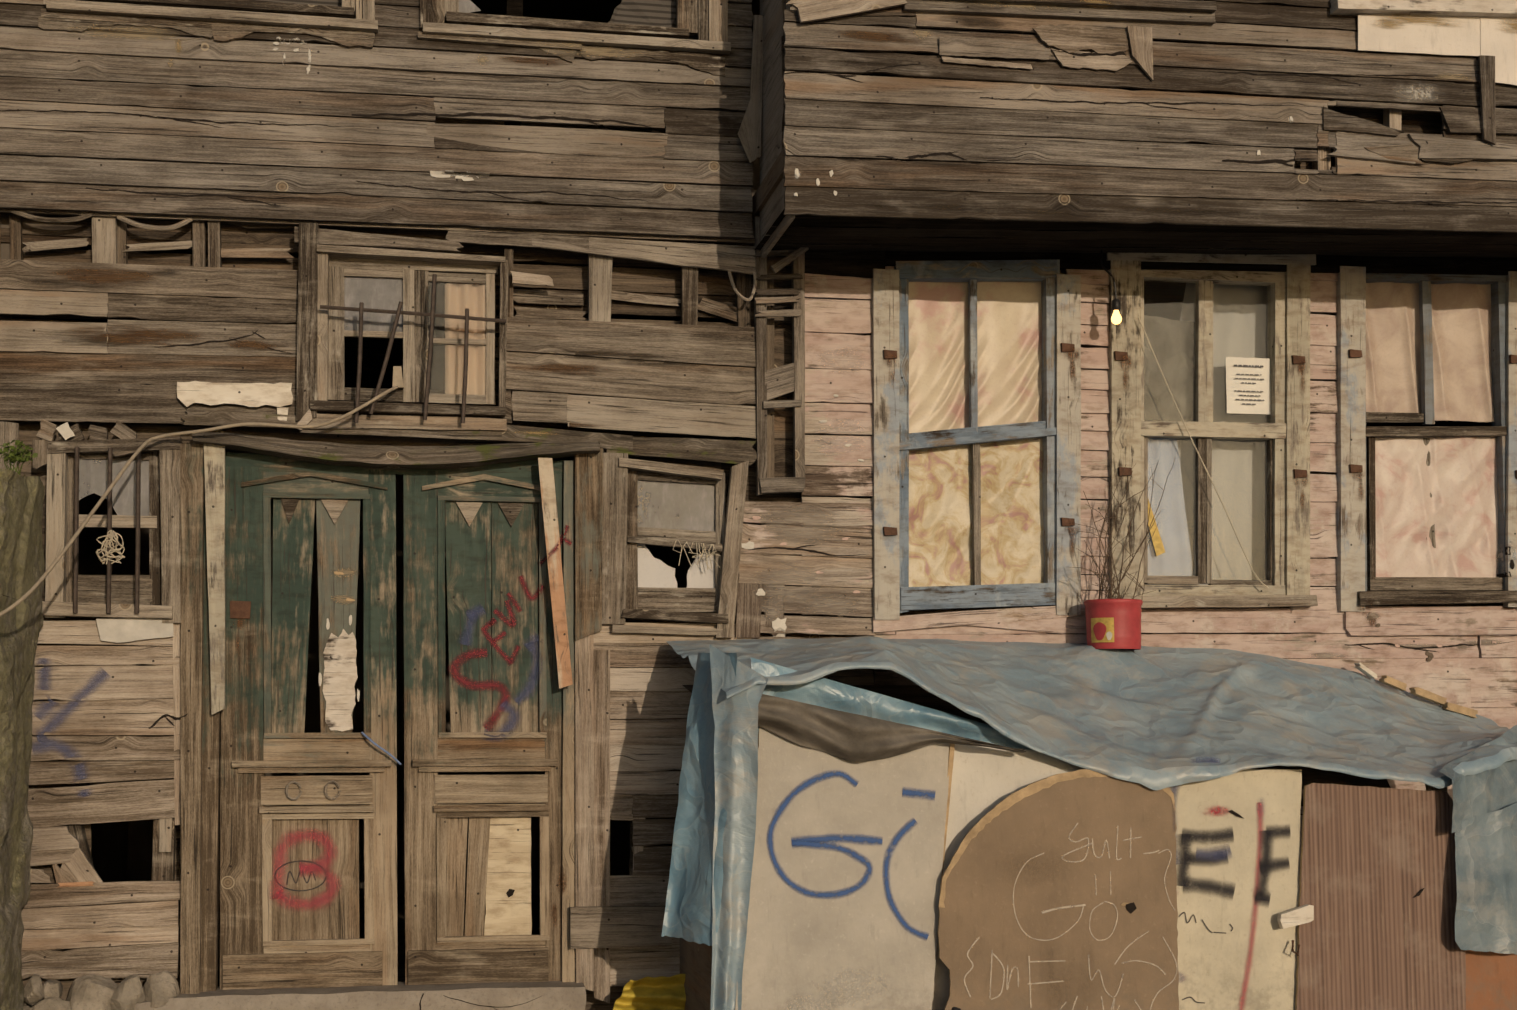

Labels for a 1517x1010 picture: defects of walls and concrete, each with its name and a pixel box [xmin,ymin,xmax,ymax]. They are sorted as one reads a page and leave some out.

crack [1345,641,1514,652]
peeling [319,596,360,731]
crack [419,993,541,1010]